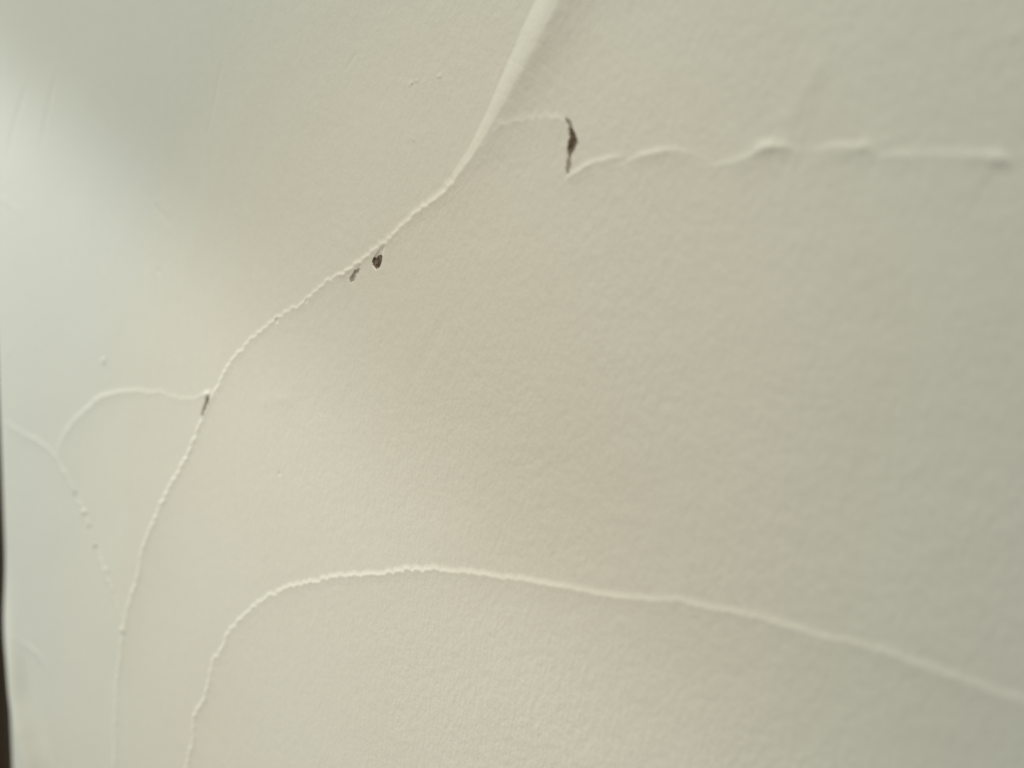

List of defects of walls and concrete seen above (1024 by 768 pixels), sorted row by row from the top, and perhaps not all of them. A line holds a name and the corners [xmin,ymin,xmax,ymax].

crack [559,108,1018,185]
crack [113,0,573,768]
crack [184,563,1024,768]